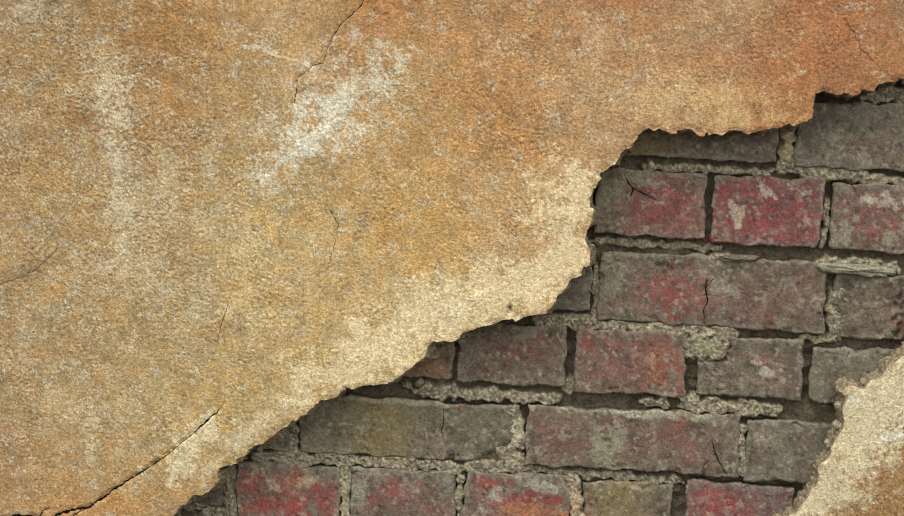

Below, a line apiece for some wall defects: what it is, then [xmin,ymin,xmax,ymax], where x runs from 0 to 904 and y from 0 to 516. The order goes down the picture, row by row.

peeling [229,21,426,203]
crack [292,0,364,109]
flaking render [160,64,904,516]
crack [12,405,223,516]